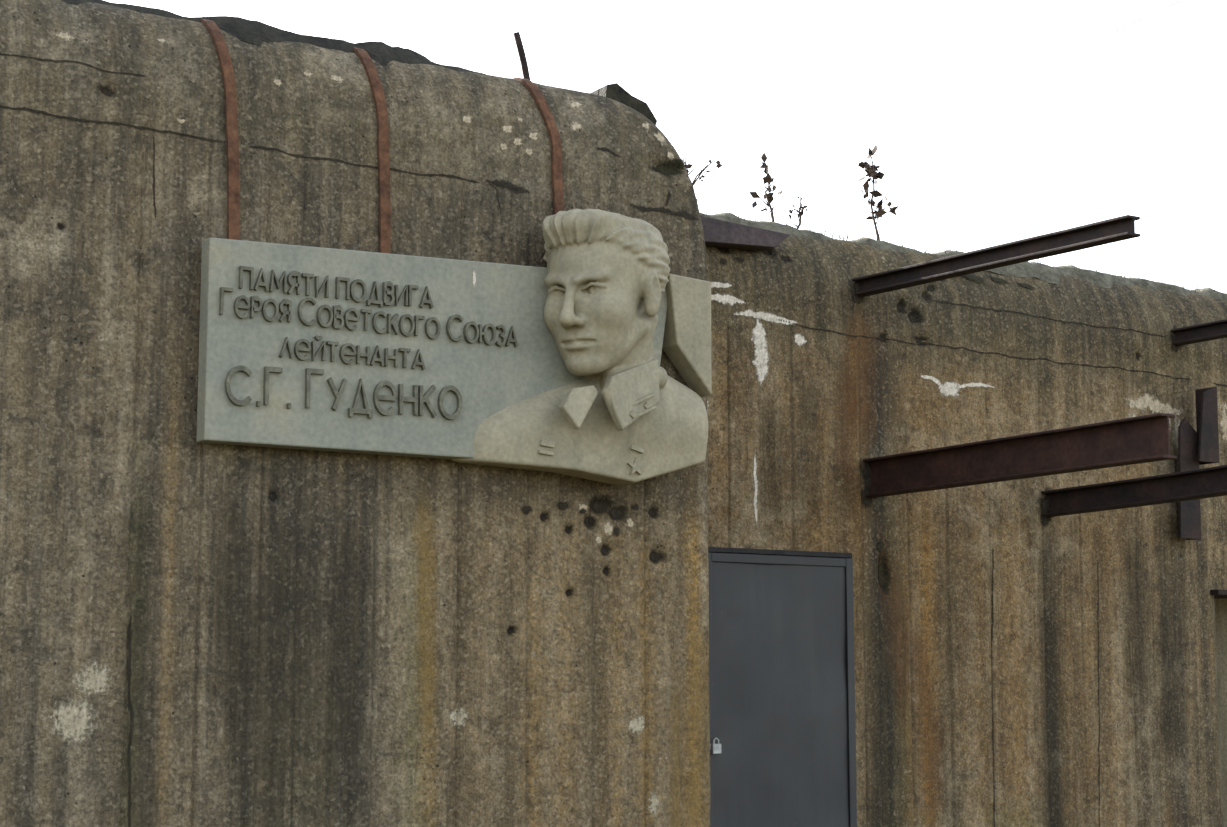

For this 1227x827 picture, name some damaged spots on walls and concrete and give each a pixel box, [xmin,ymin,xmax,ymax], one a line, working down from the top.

spalling [522,495,658,576]
spalling [650,551,664,563]
crack [125,617,133,827]